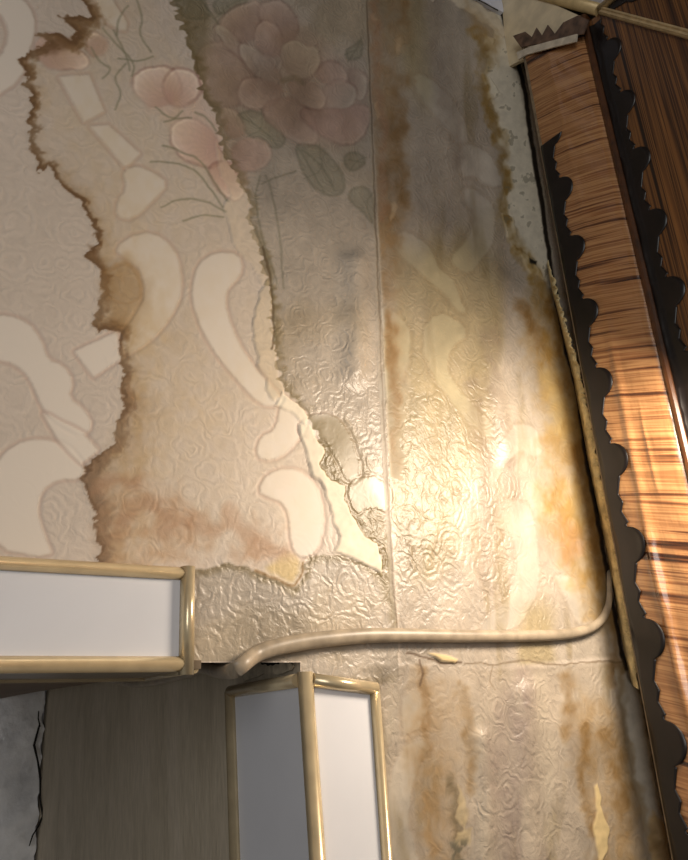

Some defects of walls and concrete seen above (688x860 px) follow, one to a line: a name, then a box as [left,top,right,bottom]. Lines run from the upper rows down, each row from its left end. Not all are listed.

peeling [213,138,309,424]
leakage [15,0,603,663]
spalling [447,0,556,283]
crack [29,711,43,846]
leakage [261,622,615,860]
peeling [591,782,611,860]